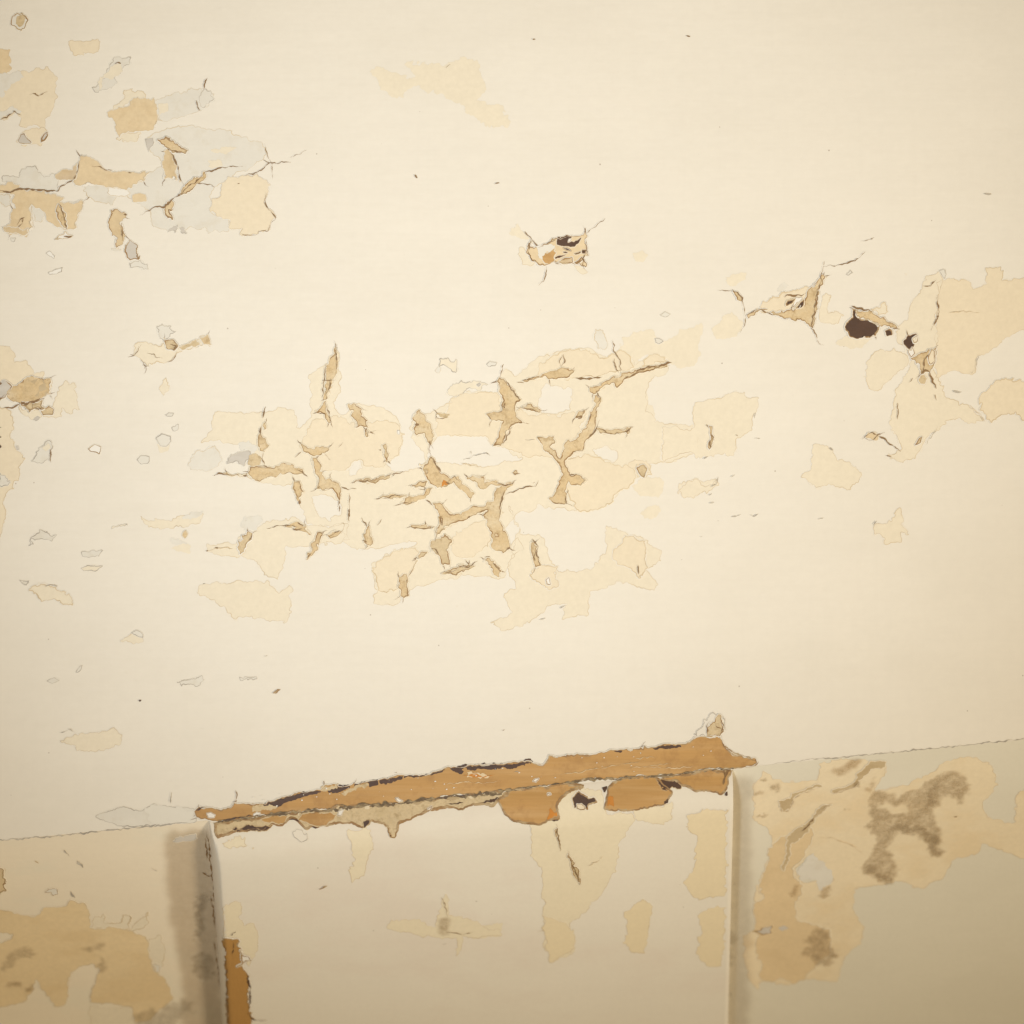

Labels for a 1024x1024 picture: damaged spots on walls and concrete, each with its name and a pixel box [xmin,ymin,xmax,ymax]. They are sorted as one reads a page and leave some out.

peeling [370,56,511,128]
peeling [0,48,276,275]
peeling [509,220,604,286]
peeling [130,324,212,368]
peeling [759,266,1024,463]
peeling [0,345,80,542]
peeling [196,323,759,632]
peeling [800,443,862,491]
peeling [191,712,1024,989]
peeling [0,888,174,1023]
peeling [221,901,267,1024]